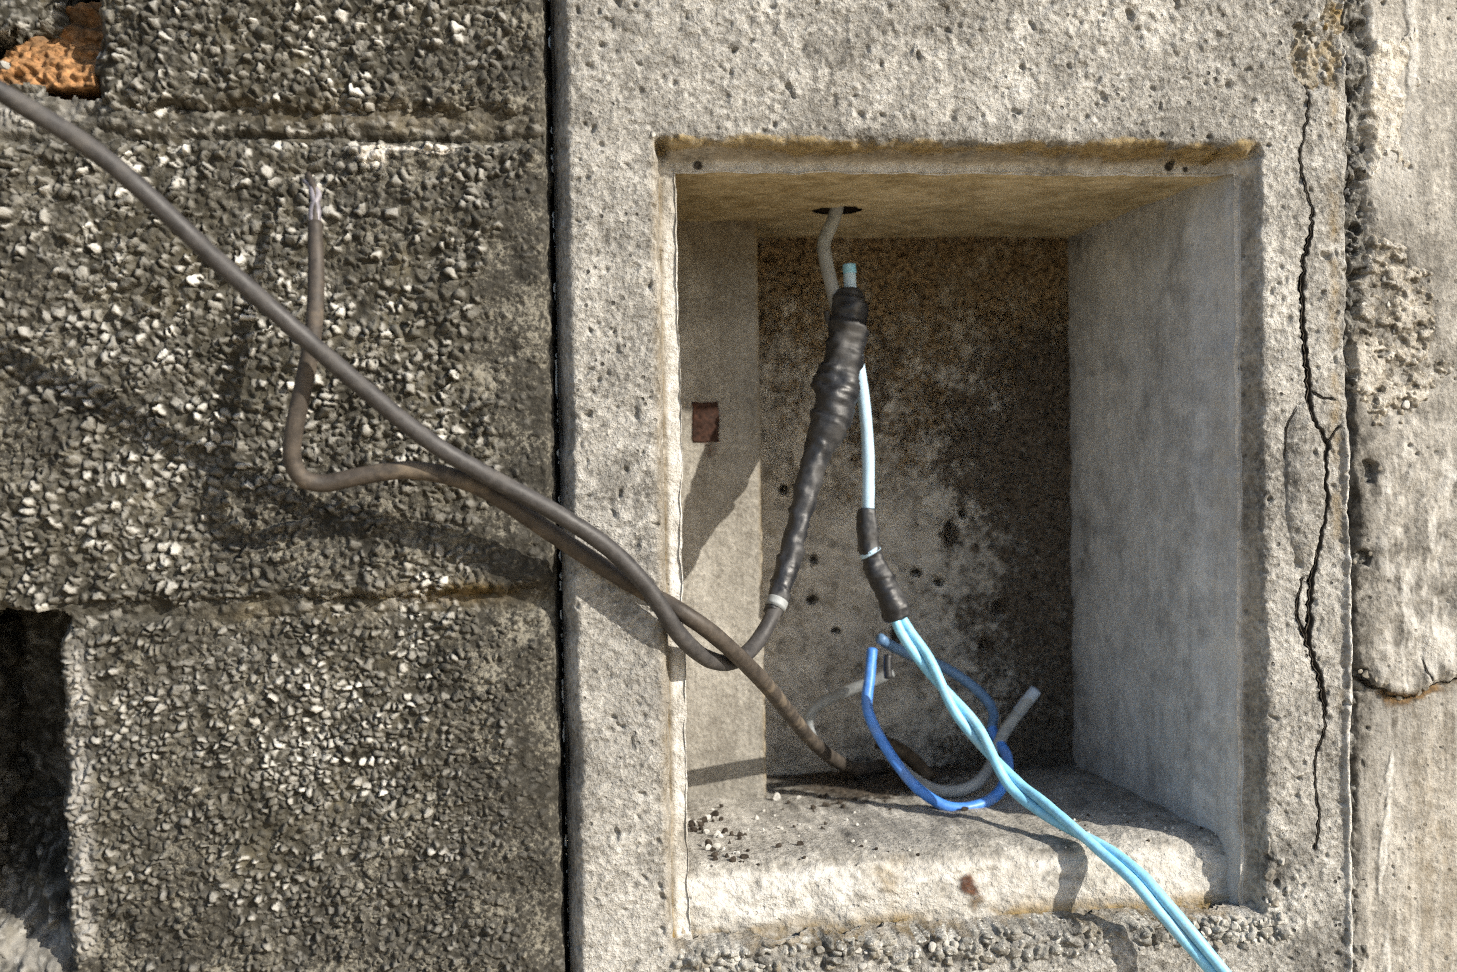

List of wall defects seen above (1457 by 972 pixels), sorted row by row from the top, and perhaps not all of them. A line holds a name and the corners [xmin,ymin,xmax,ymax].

damp [757,236,1074,768]
crack [1284,85,1457,850]
spalling [1344,234,1455,426]